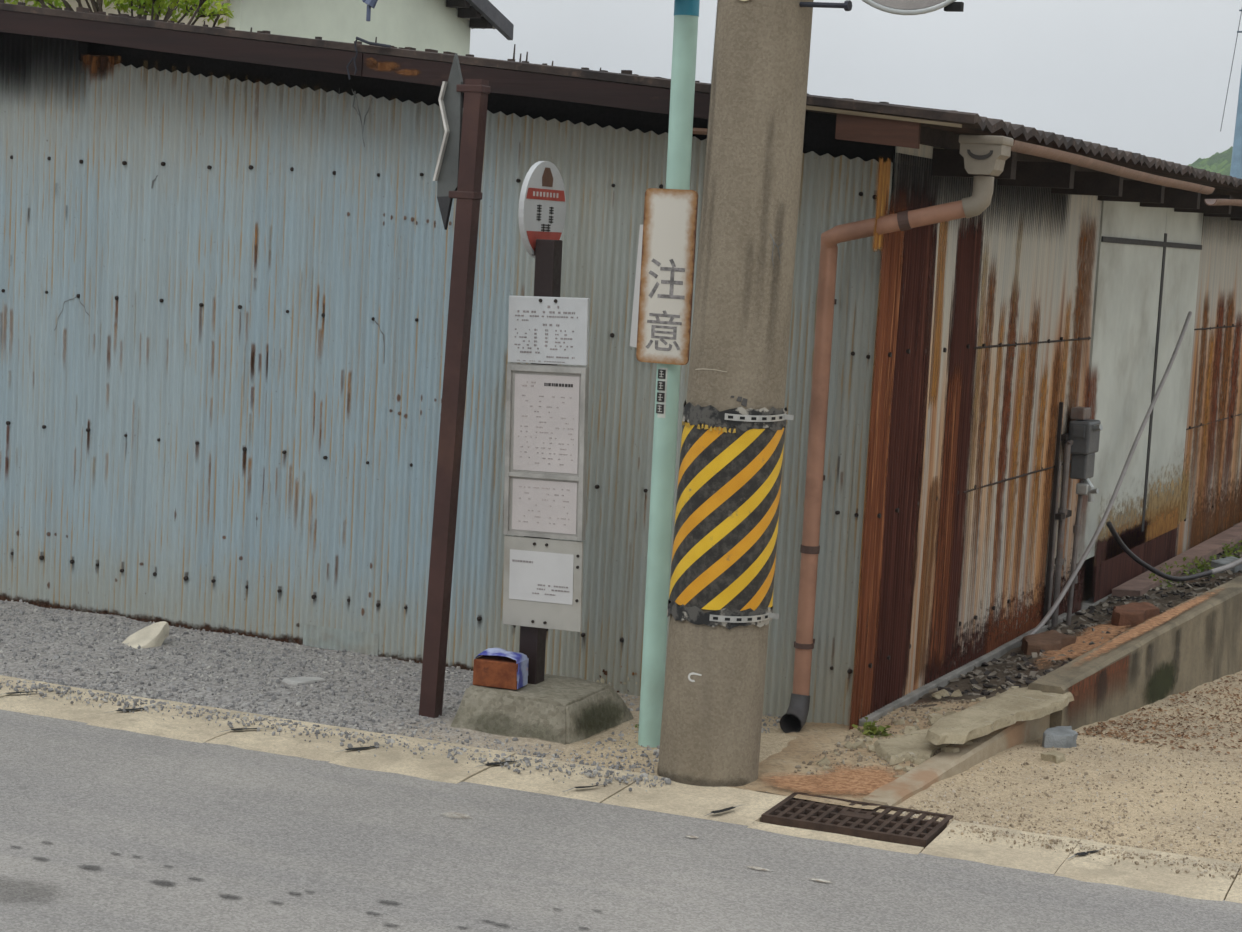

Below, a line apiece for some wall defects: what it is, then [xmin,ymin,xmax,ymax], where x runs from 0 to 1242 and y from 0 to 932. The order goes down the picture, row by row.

rust [82,55,120,77]
rust [251,345,268,370]
rust [848,158,1242,730]
rust [0,583,303,645]
rust [379,654,423,663]